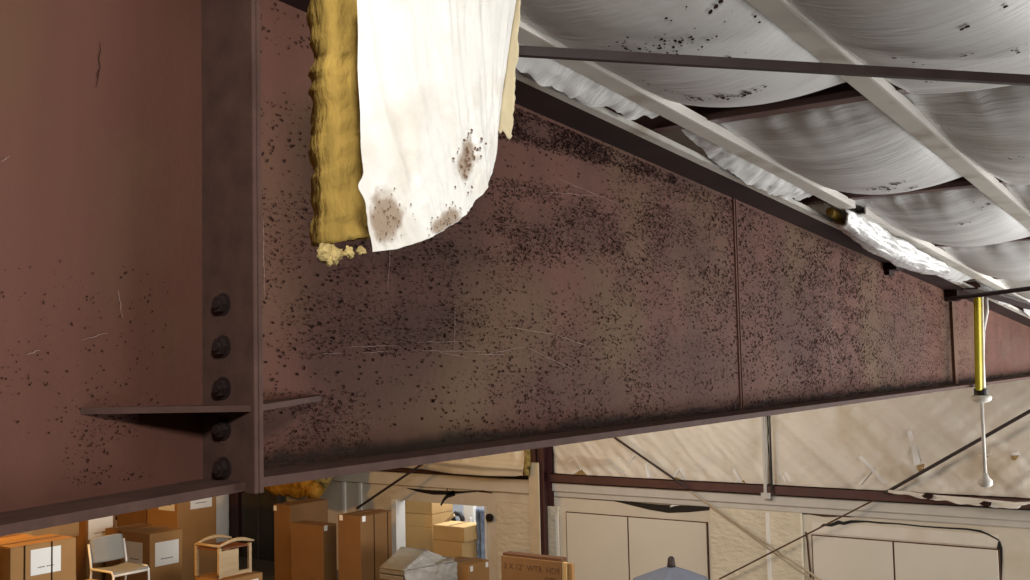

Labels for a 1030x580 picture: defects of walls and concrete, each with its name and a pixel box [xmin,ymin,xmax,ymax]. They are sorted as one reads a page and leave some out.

mould [665,86,767,101]
rust [262,107,1028,441]
rust [263,389,371,463]